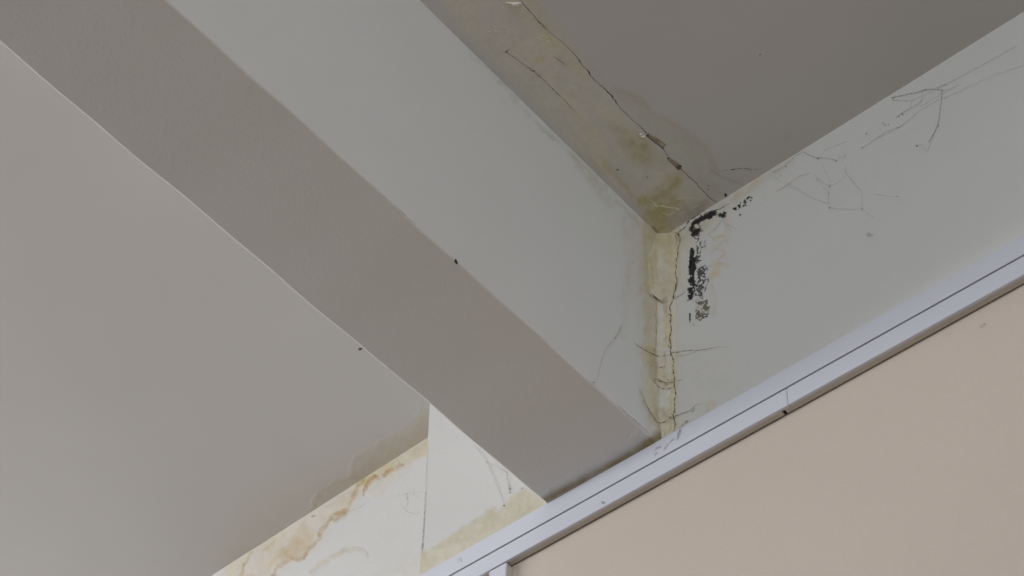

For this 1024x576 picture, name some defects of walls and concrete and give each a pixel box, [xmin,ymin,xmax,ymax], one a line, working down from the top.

leakage [438,0,804,438]
crack [667,210,737,432]
leakage [213,403,430,576]